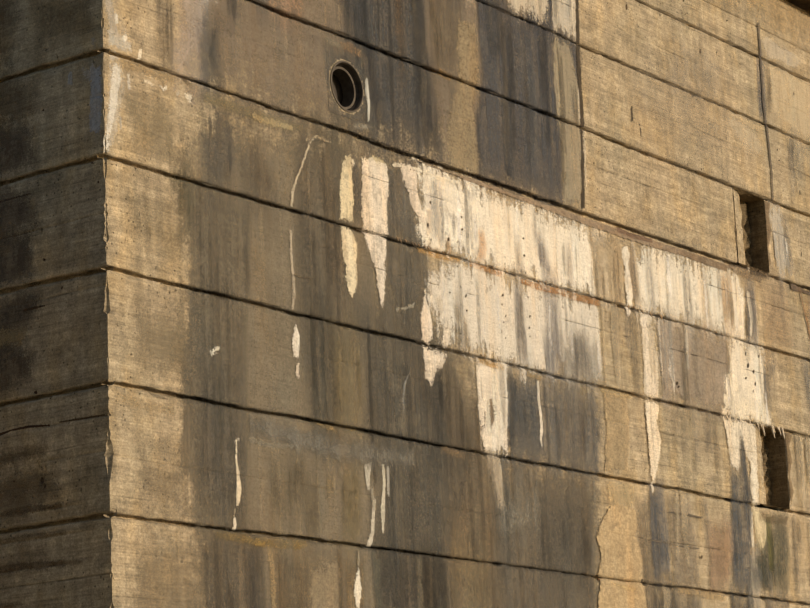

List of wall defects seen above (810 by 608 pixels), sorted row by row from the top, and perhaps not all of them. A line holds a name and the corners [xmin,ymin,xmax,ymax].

leakage [141,0,789,608]
crack [754,22,774,201]